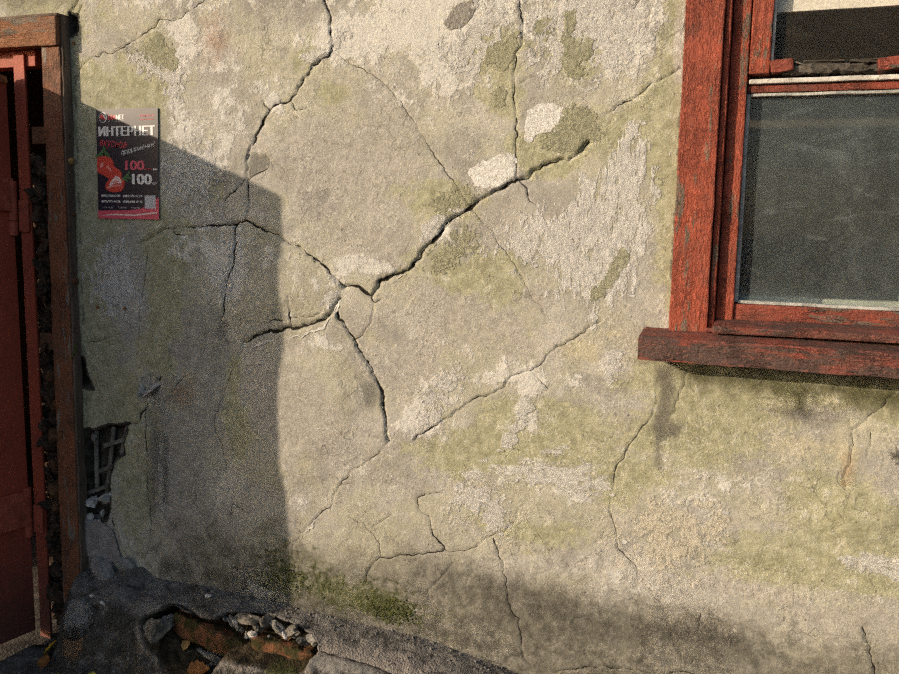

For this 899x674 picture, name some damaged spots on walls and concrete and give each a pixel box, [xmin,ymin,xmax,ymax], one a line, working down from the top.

crack [75,0,602,576]
damp [654,370,678,436]
damp [726,375,811,417]
damp [822,380,899,410]
flaking render [83,421,131,563]
crack [610,369,693,626]
crack [351,492,523,652]
crack [321,651,390,674]
crack [565,654,693,674]